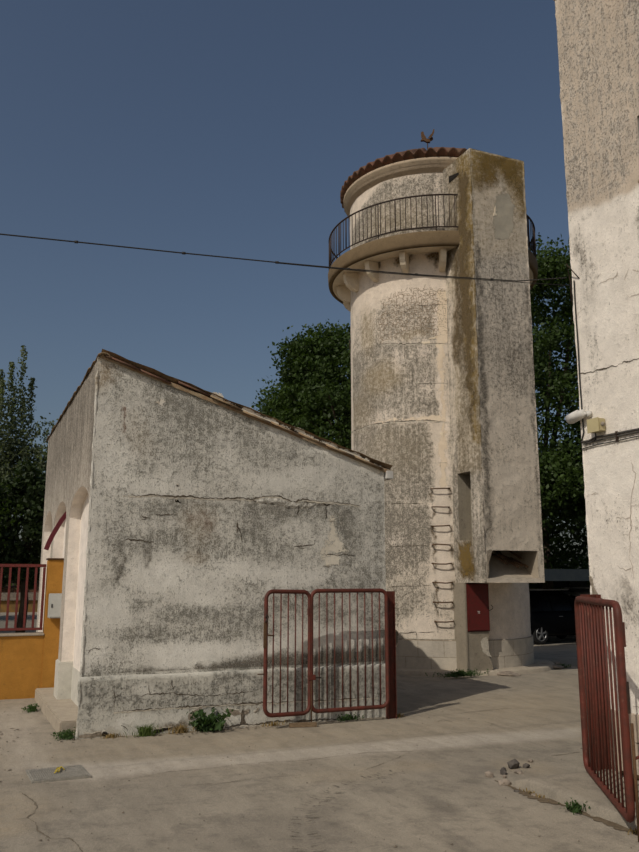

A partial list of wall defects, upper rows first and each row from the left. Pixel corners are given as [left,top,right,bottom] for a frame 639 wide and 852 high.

water stain [476,275,492,530]
crack [123,494,360,543]
crack [616,456,636,576]
crack [9,791,82,852]
crack [495,780,638,835]